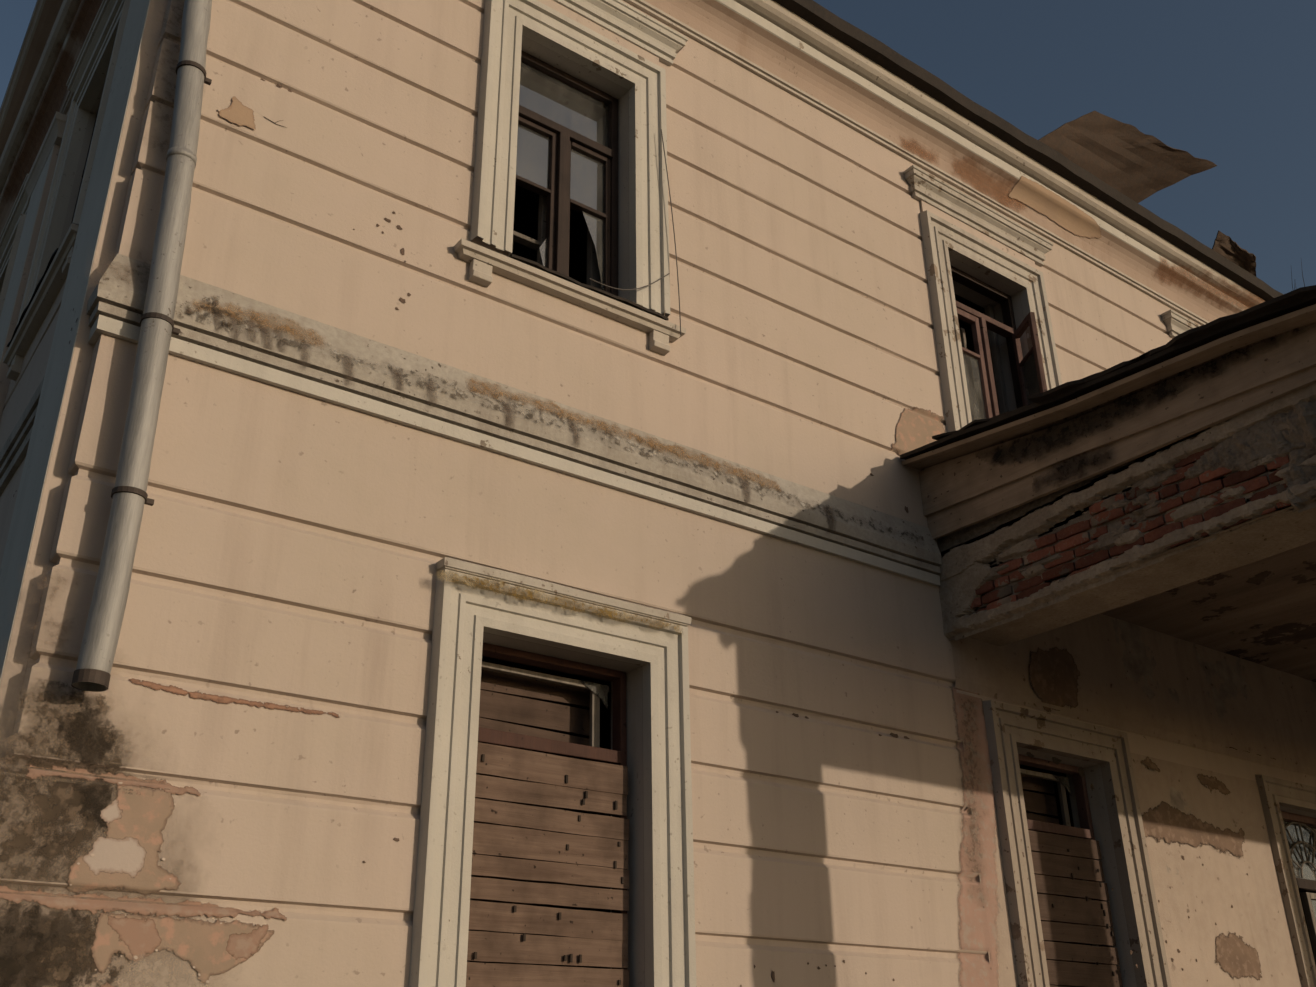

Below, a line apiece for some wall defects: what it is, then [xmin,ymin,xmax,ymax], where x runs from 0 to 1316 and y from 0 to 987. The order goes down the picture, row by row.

peeling [217,97,255,130]
leakage [176,296,924,543]
flaking render [969,401,1316,616]
peeling [129,678,341,718]
flaking render [1029,647,1080,714]
flaking render [1197,774,1230,795]
mould [0,681,133,987]
flaking render [1142,801,1245,860]
peeling [0,764,287,987]
flaking render [1215,923,1262,980]